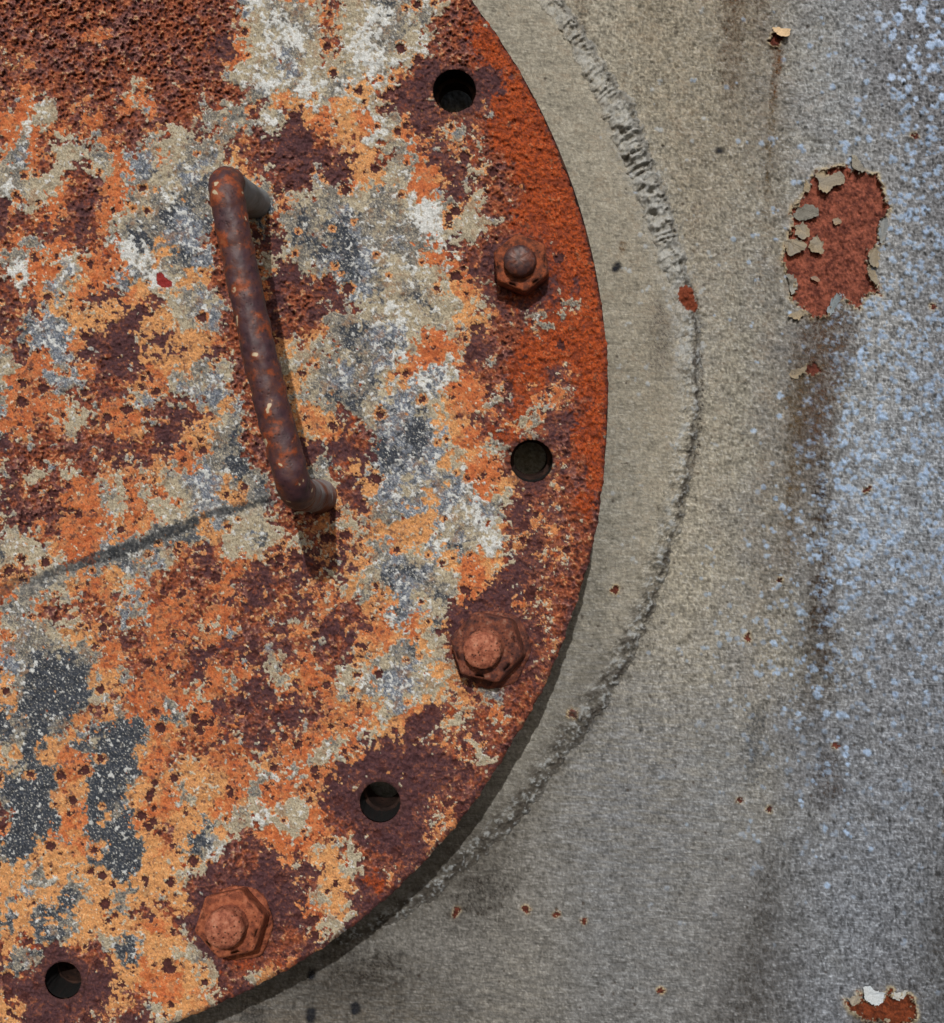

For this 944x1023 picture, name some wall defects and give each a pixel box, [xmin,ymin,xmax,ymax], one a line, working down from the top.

rust [0,0,242,133]
peeling [768,27,791,46]
rust [255,111,354,193]
rust [263,258,341,345]
rust [376,0,609,660]
peeling [784,154,890,321]
rust [0,417,140,548]
rust [436,587,549,713]
rust [317,733,465,907]
rust [157,827,316,1005]
rust [0,942,119,1023]
peeling [845,986,917,1023]